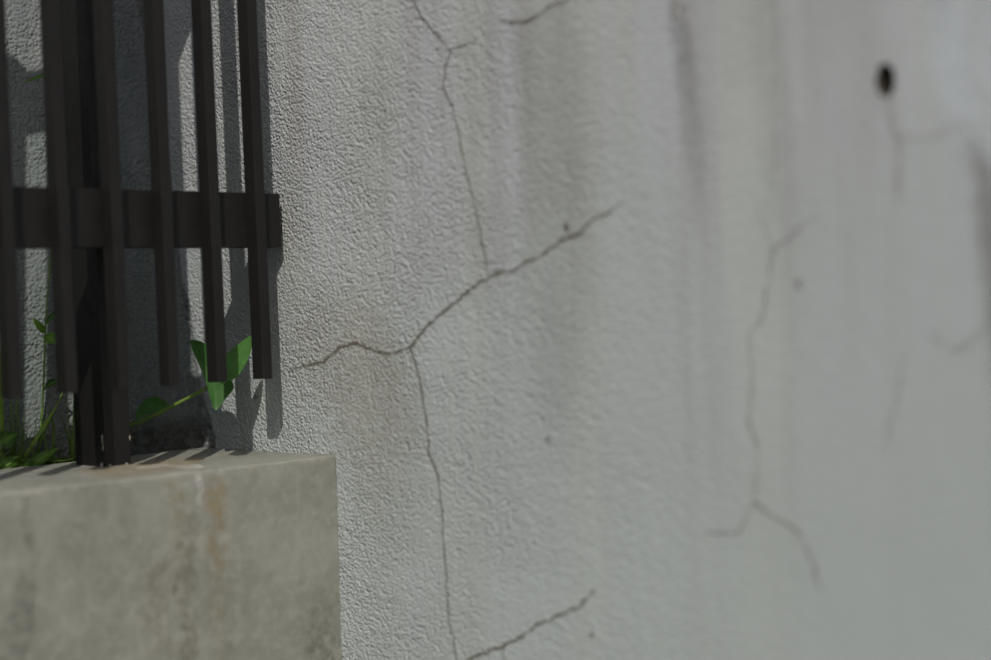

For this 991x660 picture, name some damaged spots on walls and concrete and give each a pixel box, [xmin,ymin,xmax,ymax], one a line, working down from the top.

crack [288,0,618,660]